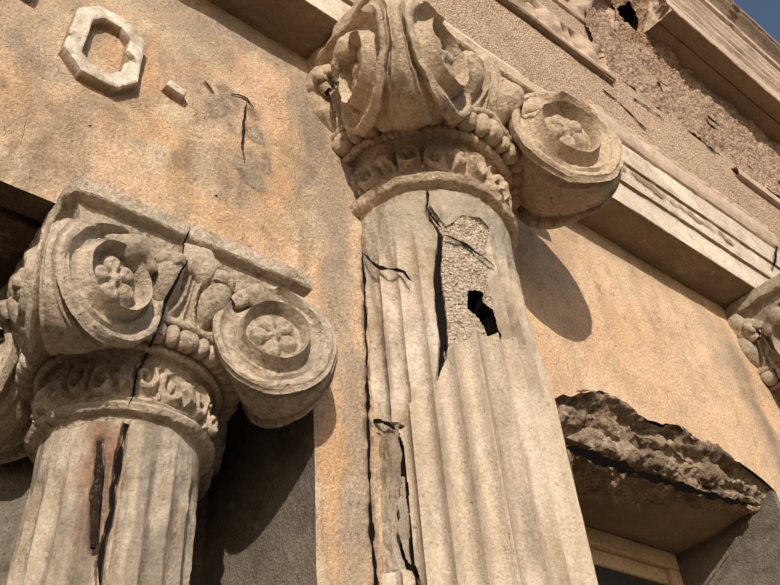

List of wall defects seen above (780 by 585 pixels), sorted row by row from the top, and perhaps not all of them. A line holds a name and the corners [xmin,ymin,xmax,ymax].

spalling [585,0,780,196]
crack [425,188,495,376]
spalling [430,208,501,361]
corrosion [89,441,104,550]
crack [97,228,190,585]
crack [361,233,422,585]